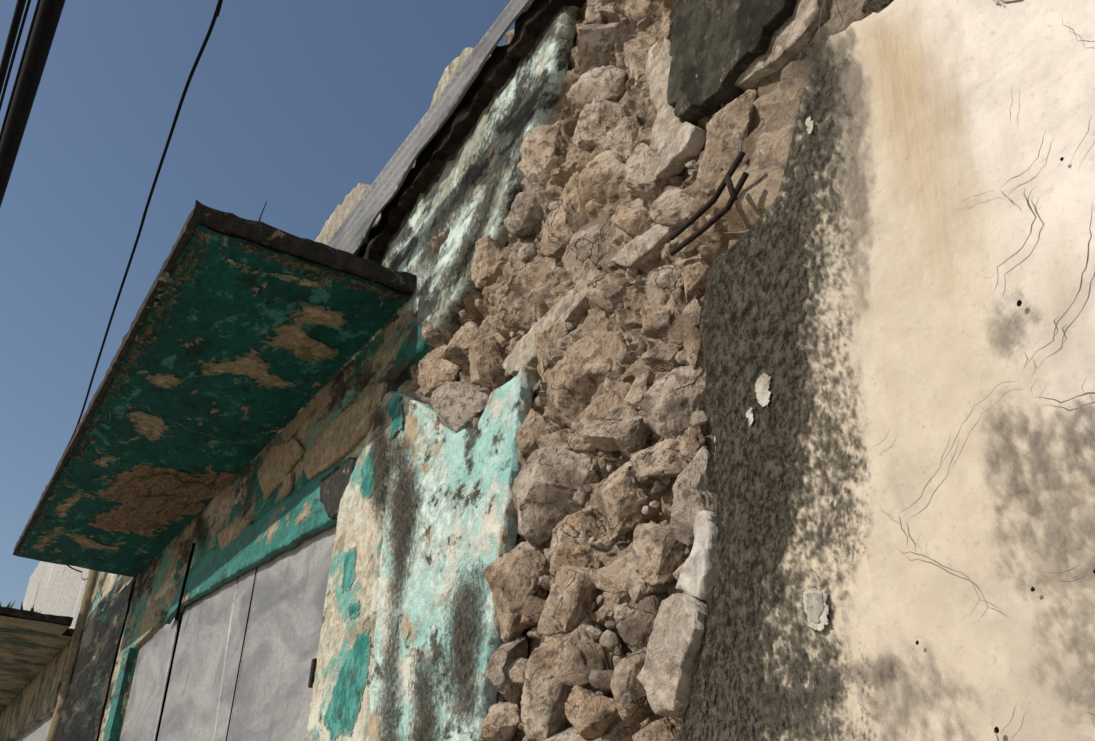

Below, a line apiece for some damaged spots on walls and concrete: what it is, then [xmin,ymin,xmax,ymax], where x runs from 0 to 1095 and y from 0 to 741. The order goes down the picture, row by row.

water stain [862,0,890,15]
water stain [234,64,532,307]
crack [960,129,1047,298]
water stain [18,230,220,557]
spalling [30,455,239,552]
peeling [125,411,170,444]
mould [369,399,485,741]
spalling [145,0,894,741]
water stain [671,30,953,741]
crack [881,213,1095,623]
water stain [997,423,1095,585]